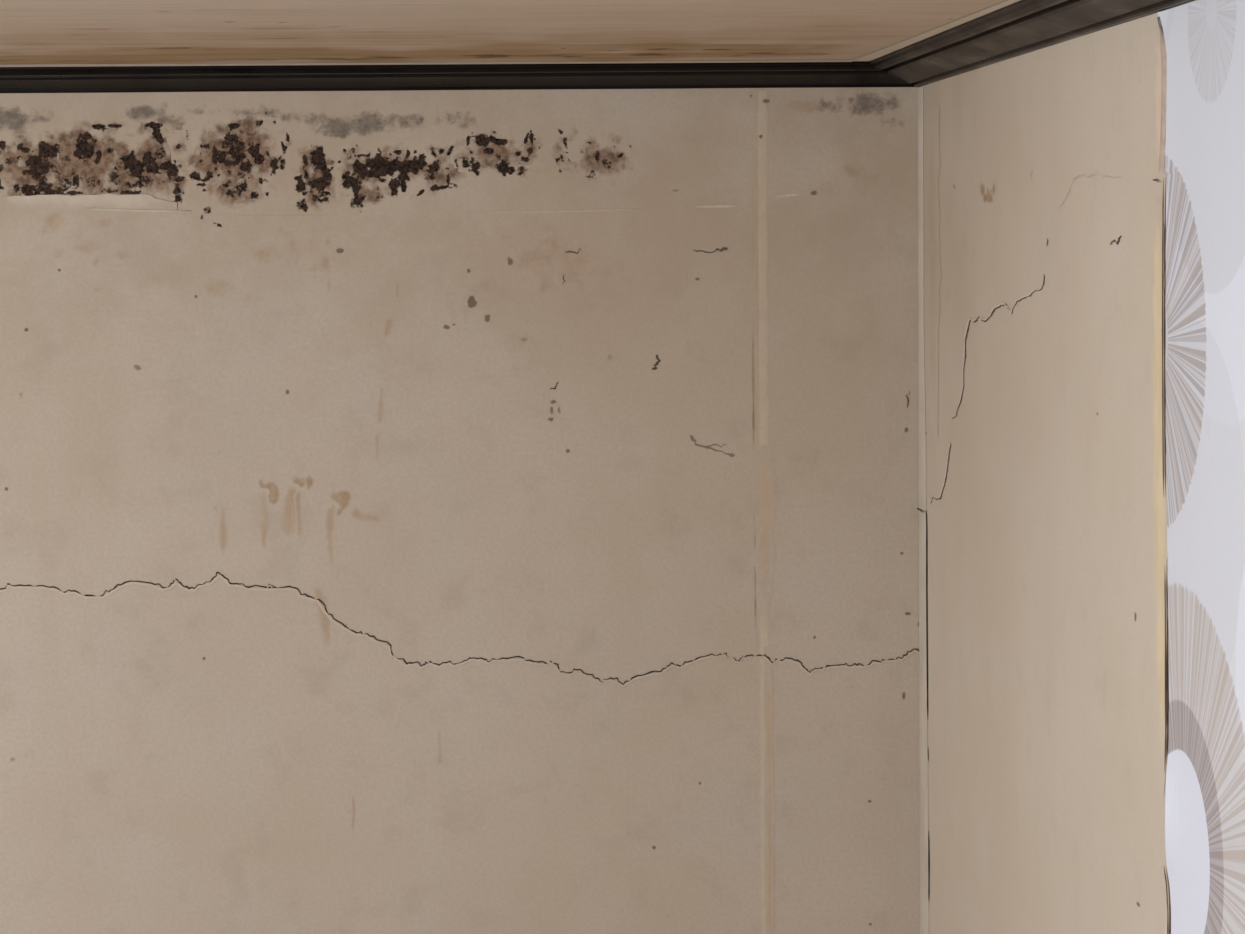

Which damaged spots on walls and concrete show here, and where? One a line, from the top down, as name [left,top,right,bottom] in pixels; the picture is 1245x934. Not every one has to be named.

water stain [0,107,657,363]
crack [917,239,1048,513]
crack [0,572,919,687]